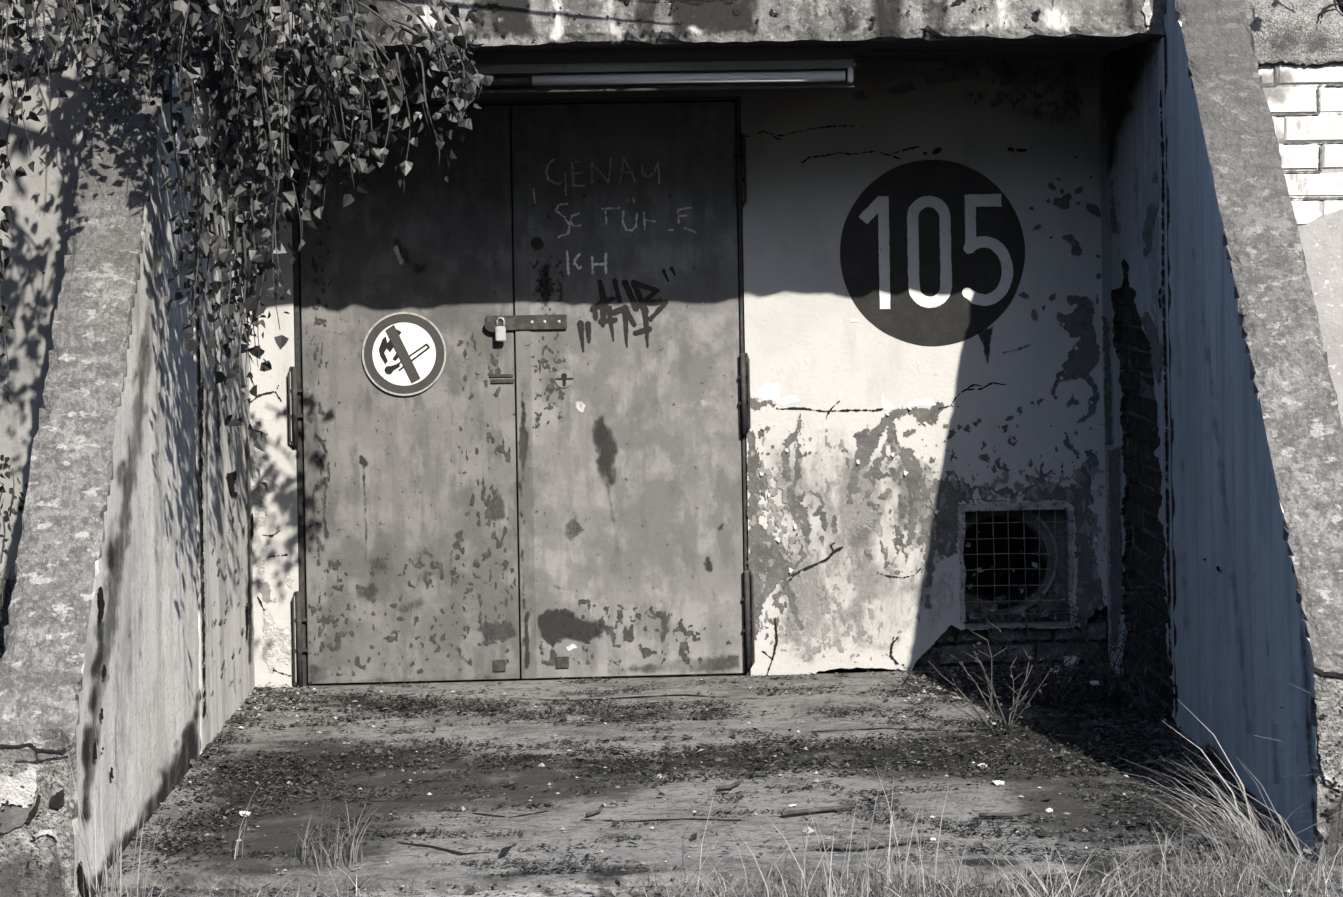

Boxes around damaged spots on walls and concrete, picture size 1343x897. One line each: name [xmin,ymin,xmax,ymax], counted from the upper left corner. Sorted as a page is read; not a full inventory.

water stain [418,7,437,28]
water stain [473,0,534,37]
spalling [1258,62,1343,226]
peeling [1029,176,1118,279]
crack [773,401,884,419]
crack [938,382,1006,410]
water stain [83,235,167,819]
peeling [746,261,1178,724]
crack [508,542,843,701]
crack [1307,663,1343,683]
water stain [87,597,210,897]
spalling [0,759,89,897]